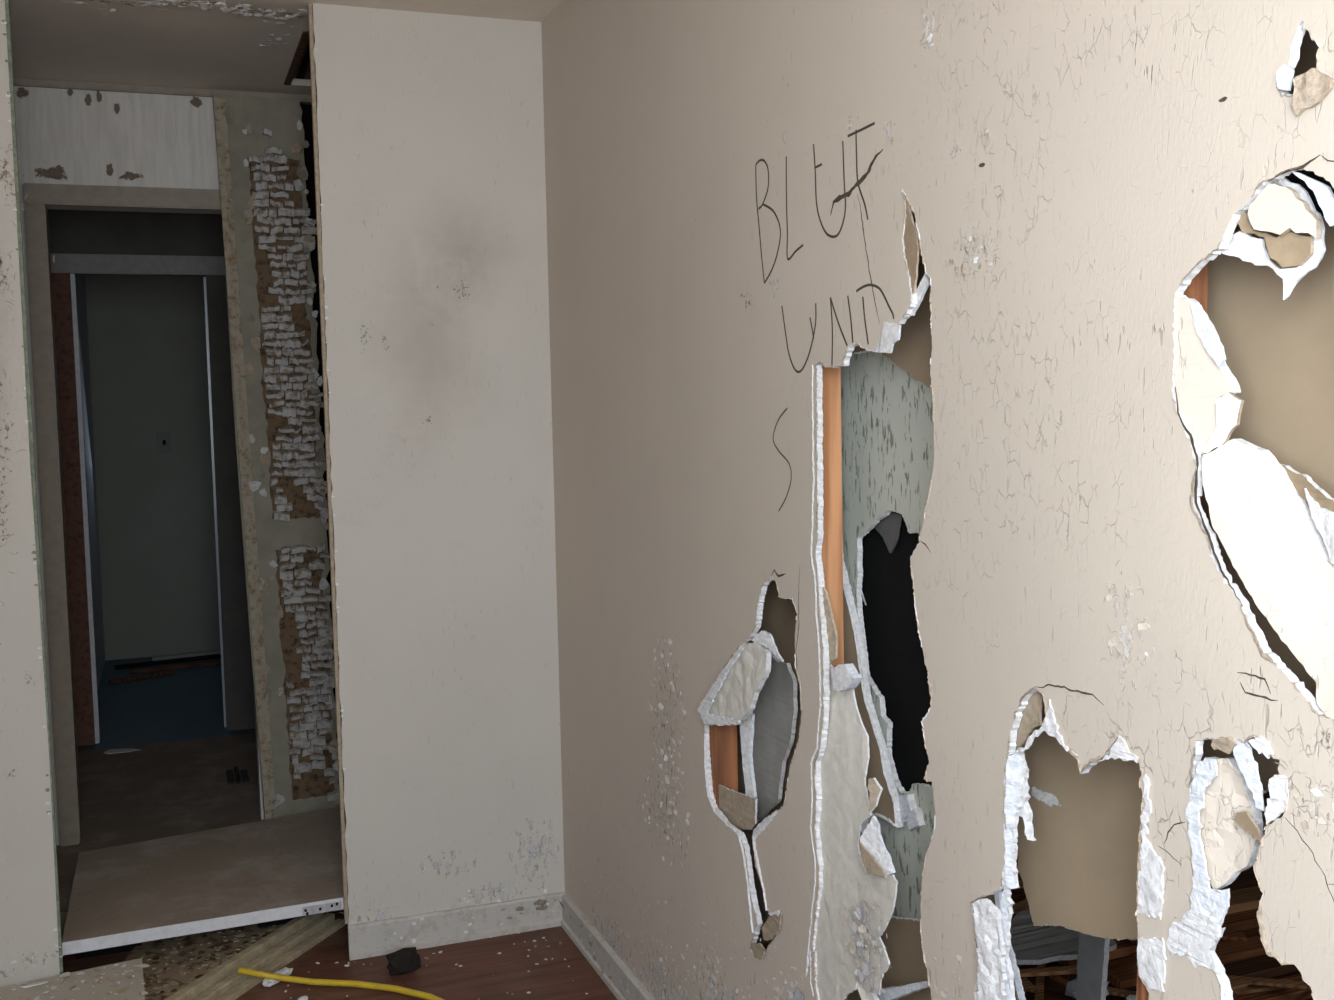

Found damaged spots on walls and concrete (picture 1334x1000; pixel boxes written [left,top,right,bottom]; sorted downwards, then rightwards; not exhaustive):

spalling [1276,32,1333,116]
peeling [292,119,322,194]
peeling [249,481,267,497]
peeling [310,422,336,530]
spalling [639,167,1334,1000]